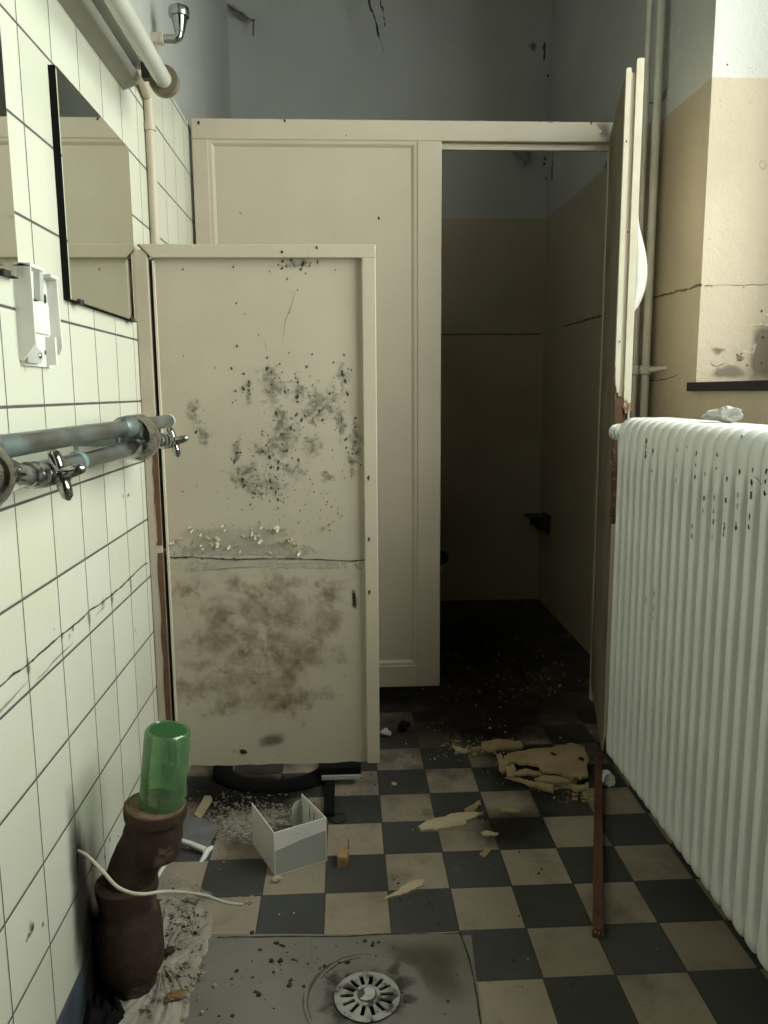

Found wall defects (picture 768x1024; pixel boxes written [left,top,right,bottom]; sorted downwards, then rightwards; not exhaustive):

crack [653,284,768,298]
water stain [716,329,768,377]
water stain [225,352,362,532]
peeling [163,525,310,558]
crack [169,555,365,563]